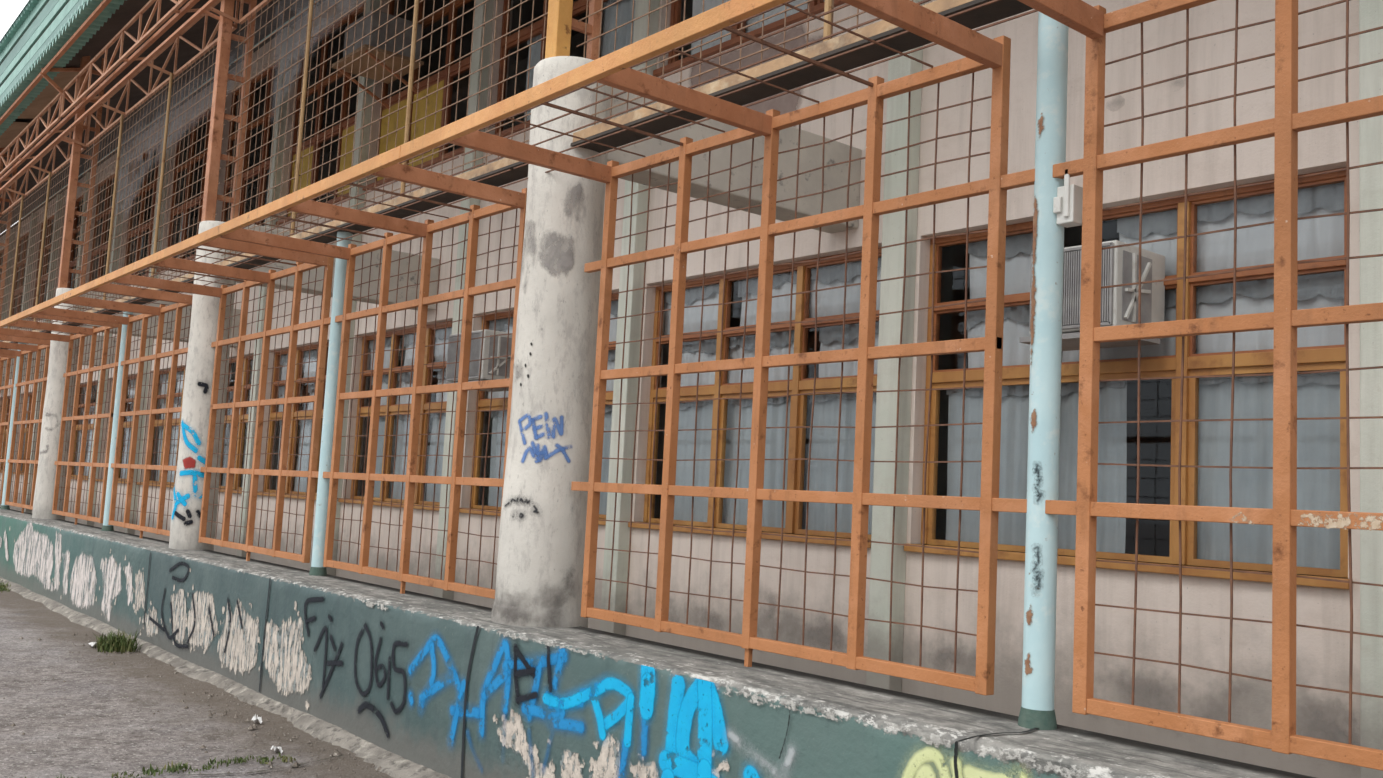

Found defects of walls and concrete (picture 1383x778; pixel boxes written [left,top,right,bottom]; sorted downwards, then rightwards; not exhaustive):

corrosion [1030,197,1038,365]
peeling [493,709,659,778]
peeling [711,750,730,778]
spalling [884,721,952,748]
crack [954,728,1038,778]
spalling [997,748,1083,778]